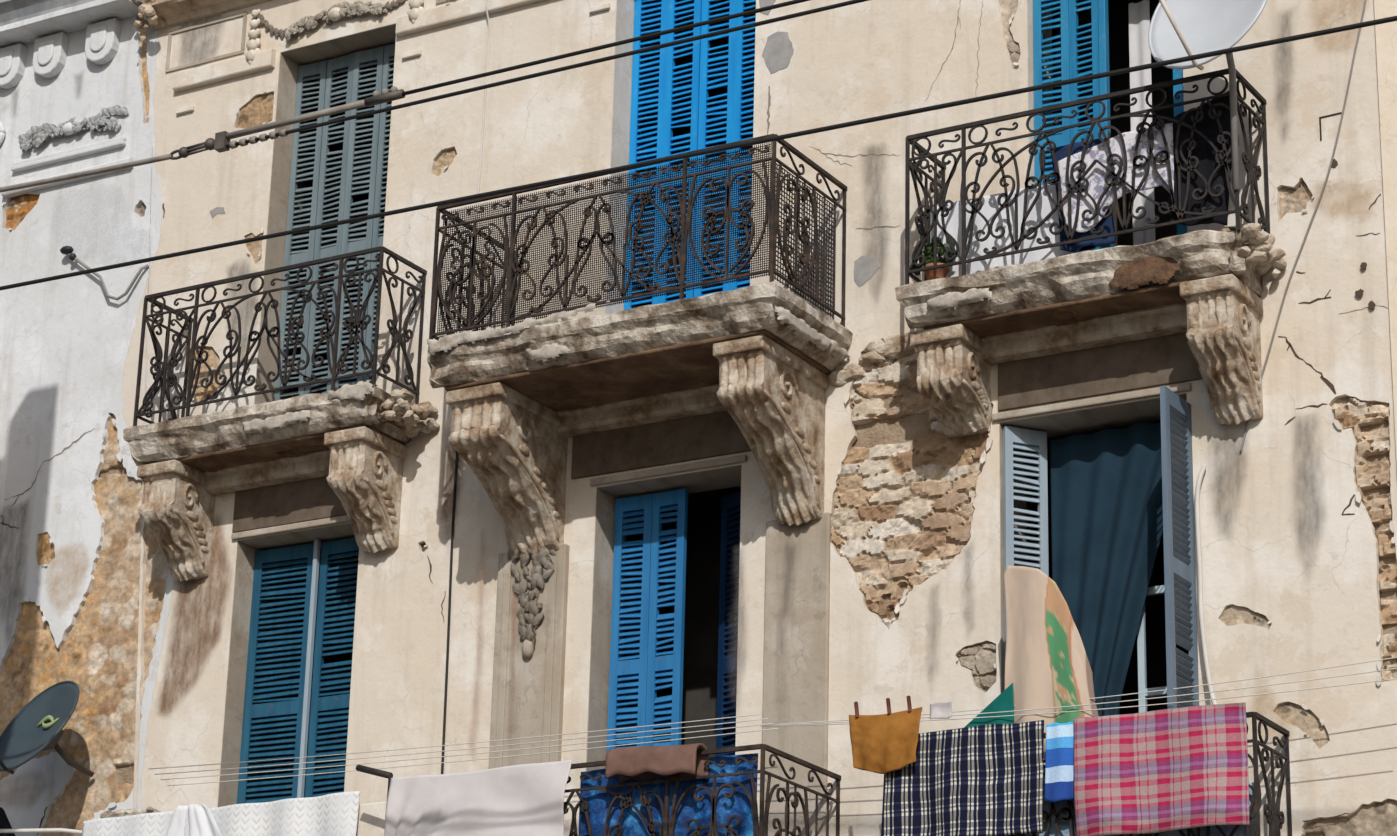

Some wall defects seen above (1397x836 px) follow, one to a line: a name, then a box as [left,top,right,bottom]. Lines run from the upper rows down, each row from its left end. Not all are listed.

peeling [999,0,1021,67]
spalling [434,147,457,177]
spalling [2,194,40,230]
spalling [1218,175,1314,278]
crack [0,428,94,528]
spalling [775,306,993,630]
spalling [1331,396,1397,686]
spalling [0,414,169,836]
spalling [1220,605,1272,629]
spalling [956,642,997,693]
spalling [1275,702,1330,749]
spalling [1304,799,1397,836]